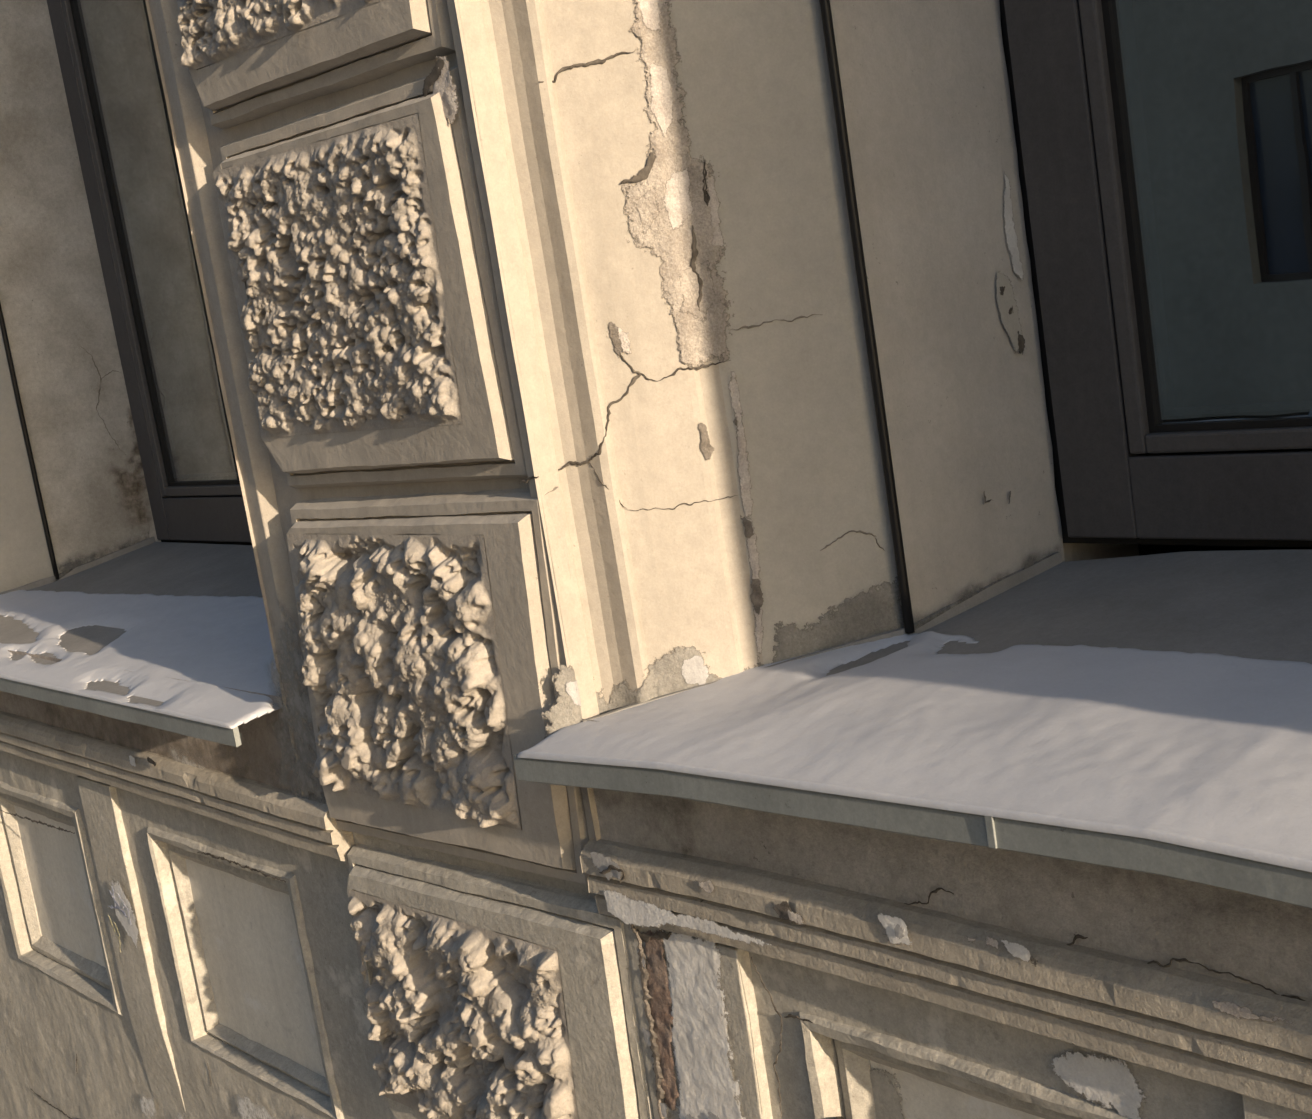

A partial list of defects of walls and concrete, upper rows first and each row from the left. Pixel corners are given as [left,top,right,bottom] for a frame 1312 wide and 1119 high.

spalling [423,56,459,124]
crack [538,52,632,83]
peeling [621,0,764,661]
crack [520,314,819,511]
peeling [681,655,709,685]
crack [904,888,954,905]
crack [1066,934,1088,946]
peeling [590,852,772,1119]
crack [1147,958,1305,1001]
crack [751,957,813,1117]
peeling [869,1068,904,1119]
peeling [1051,1050,1146,1119]